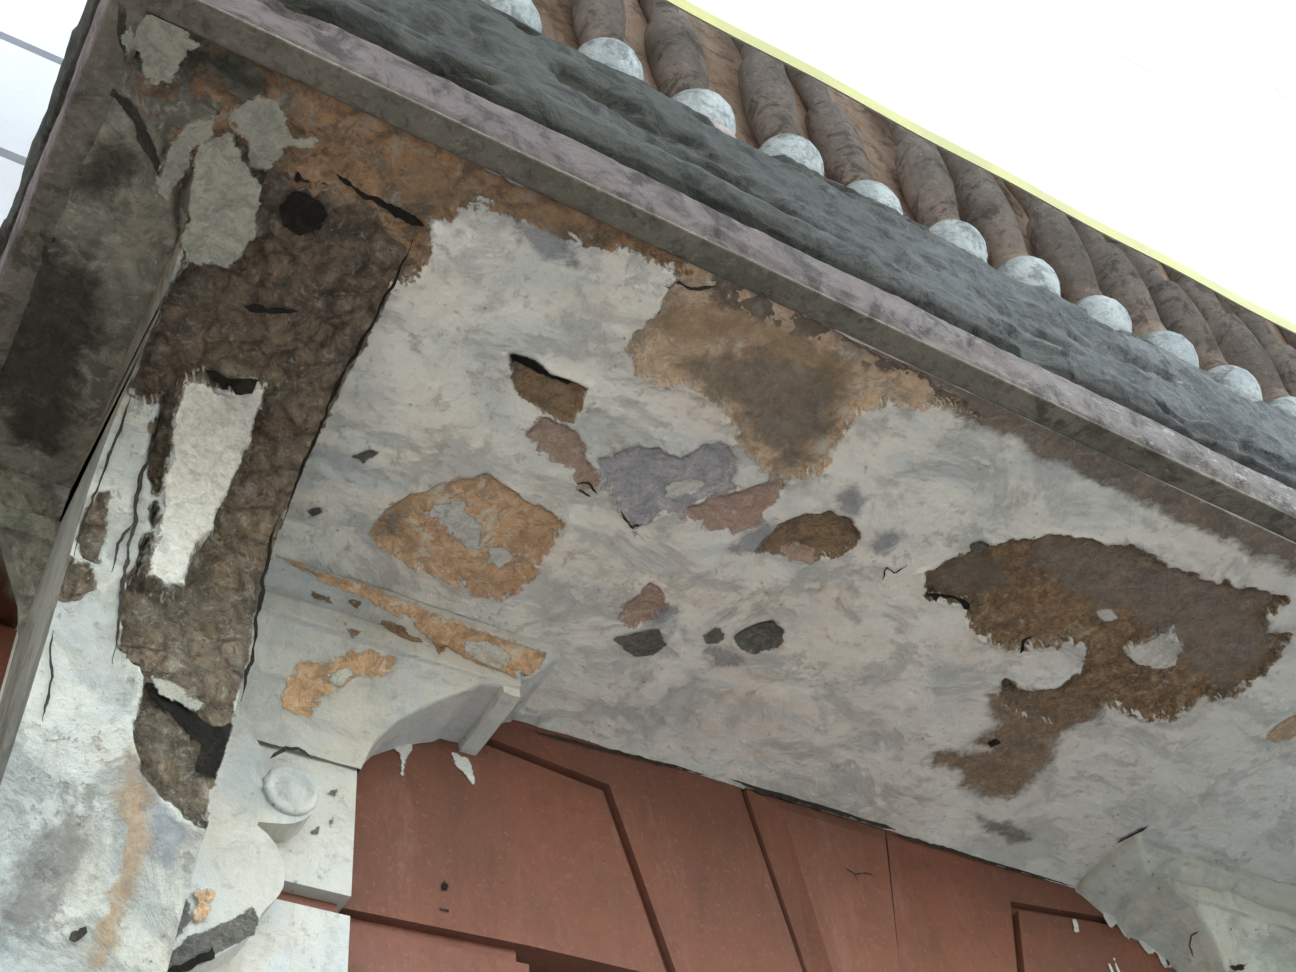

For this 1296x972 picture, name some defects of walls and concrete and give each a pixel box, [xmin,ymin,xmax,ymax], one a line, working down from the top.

crack [110,88,160,177]
spalling [117,14,980,828]
spalling [58,490,112,602]
crack [74,394,163,664]
crack [42,630,54,721]
spalling [920,533,1296,800]
spalling [167,888,258,972]